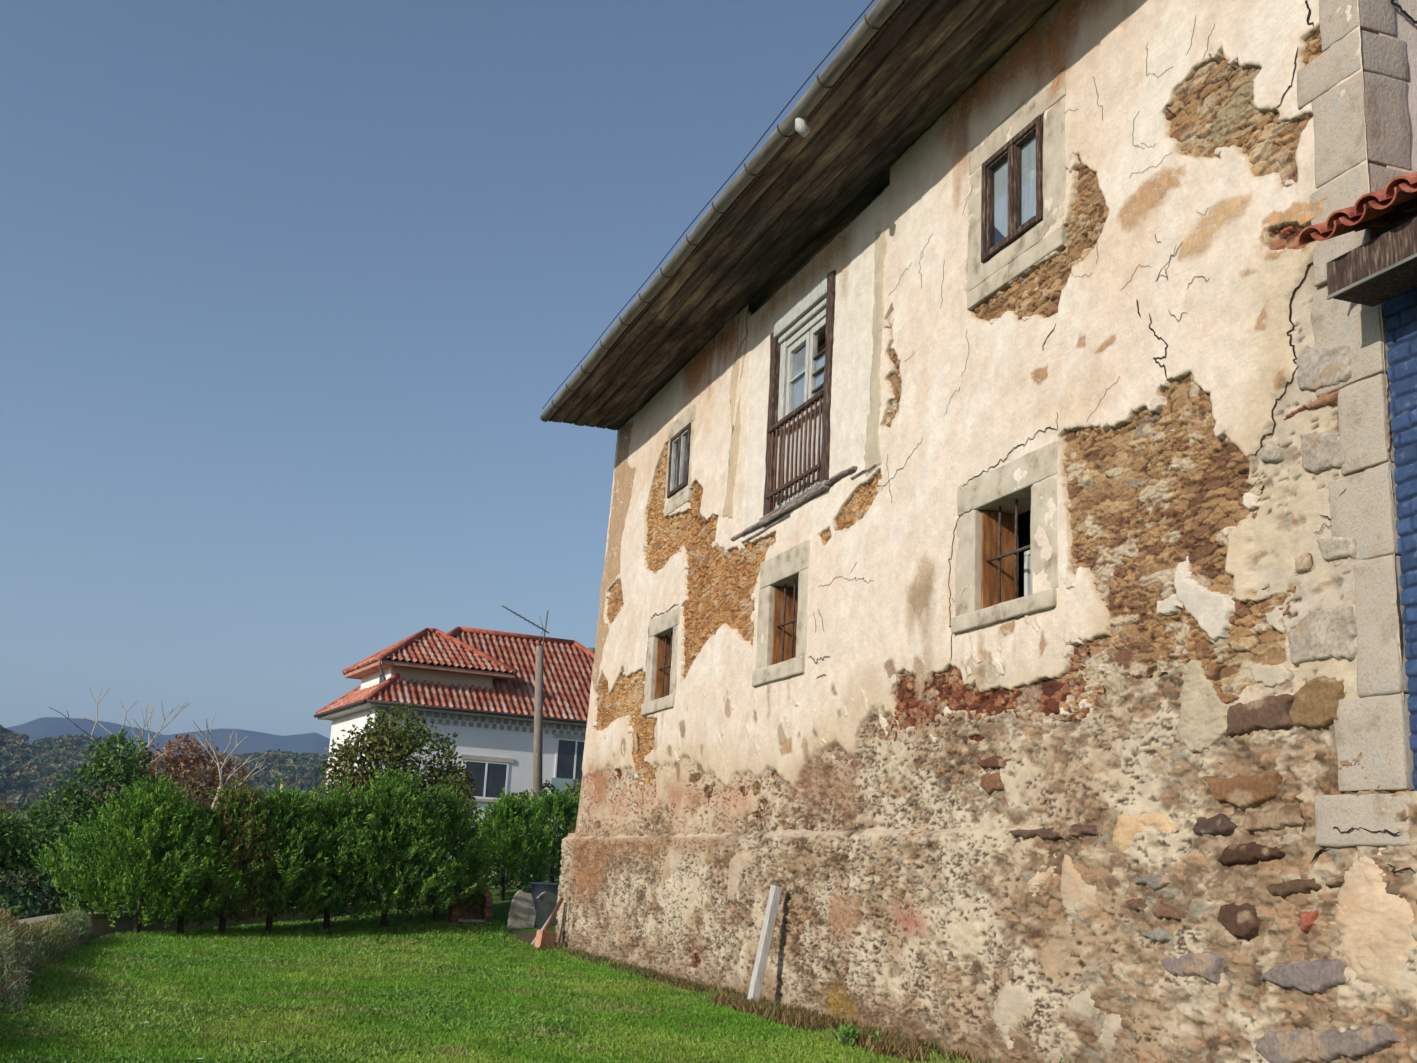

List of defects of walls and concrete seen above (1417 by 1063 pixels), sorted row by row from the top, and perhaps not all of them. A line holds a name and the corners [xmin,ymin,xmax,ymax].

crack [1065,77,1171,178]
spalling [972,39,1328,325]
crack [1146,17,1215,77]
crack [1391,0,1417,24]
spalling [883,309,902,427]
crack [1064,218,1209,380]
crack [1247,262,1313,457]
spalling [592,421,734,803]
spalling [643,444,776,678]
spalling [820,472,882,546]
crack [948,376,1120,657]
spalling [832,373,1358,753]